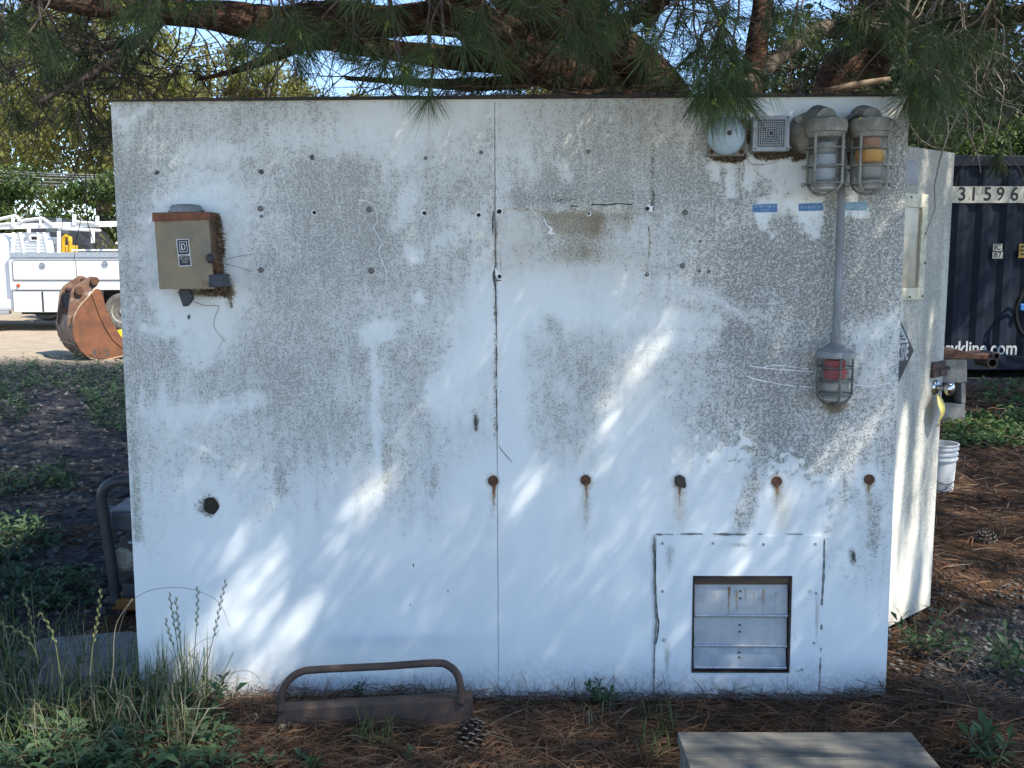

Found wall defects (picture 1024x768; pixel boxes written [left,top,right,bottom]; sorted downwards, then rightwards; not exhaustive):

leakage [520,192,630,257]